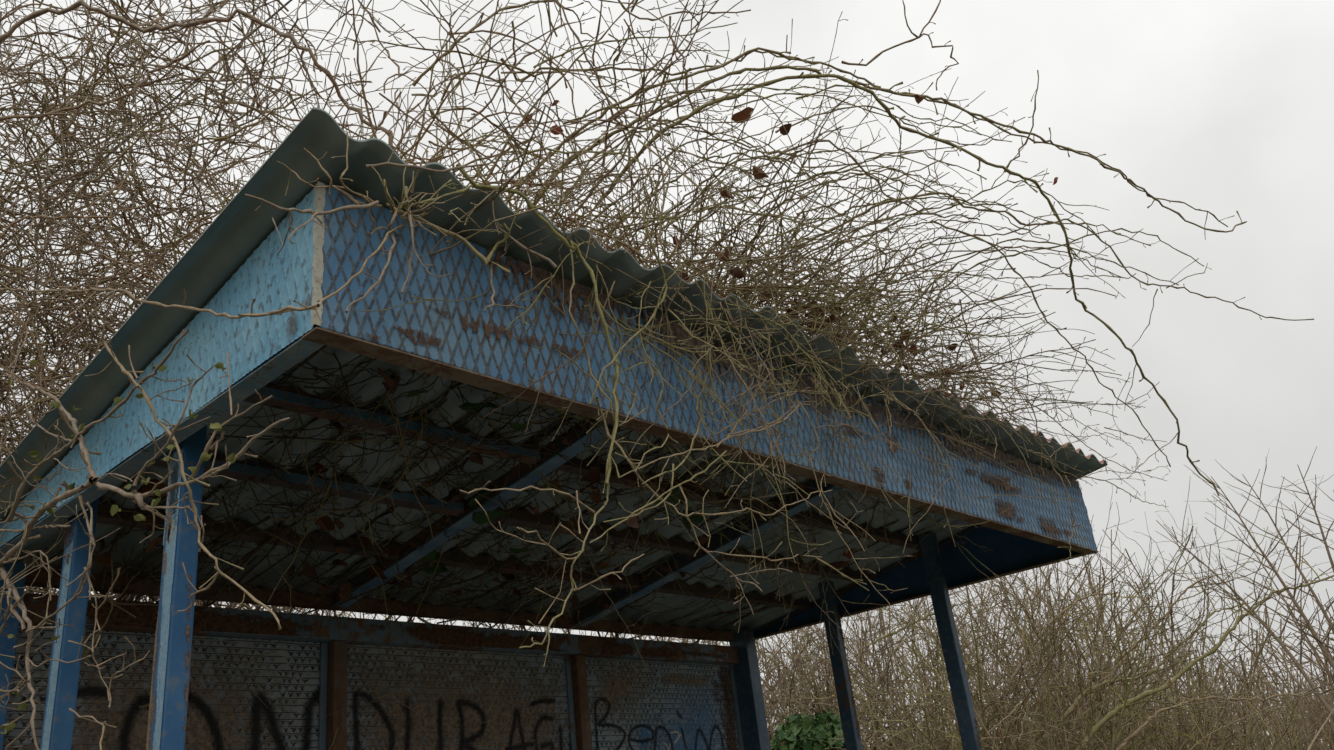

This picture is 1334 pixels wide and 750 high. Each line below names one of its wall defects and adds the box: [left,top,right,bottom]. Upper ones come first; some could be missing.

corrosion [430,307,580,357]
corrosion [486,248,1082,538]
corrosion [86,600,158,628]
corrosion [193,608,314,636]